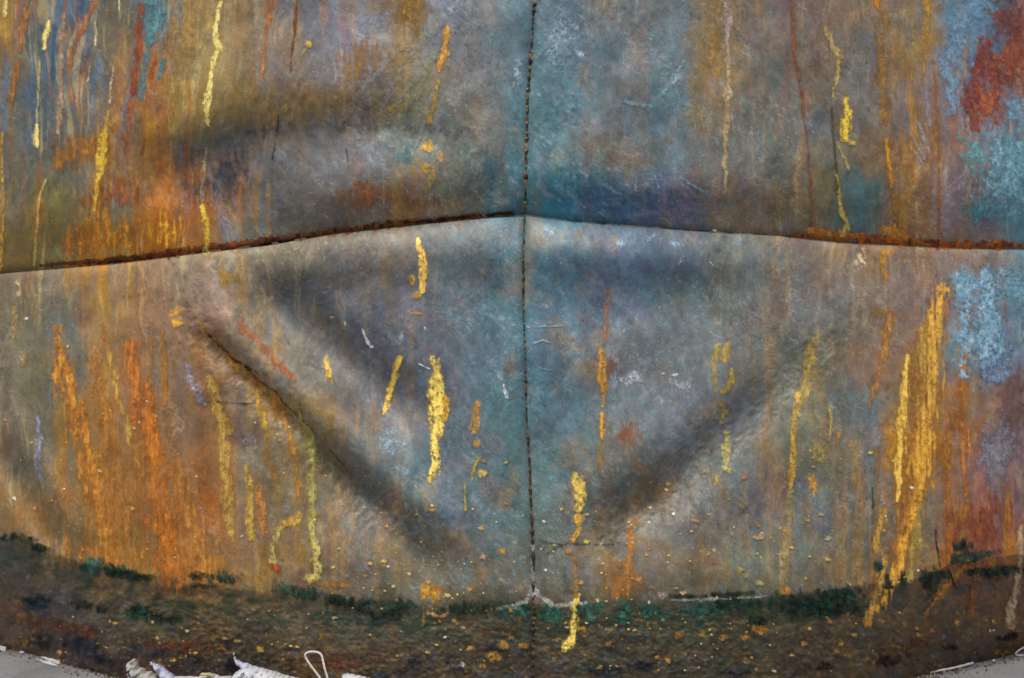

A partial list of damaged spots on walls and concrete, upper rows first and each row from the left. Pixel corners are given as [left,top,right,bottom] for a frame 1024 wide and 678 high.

corrosion [9,0,31,110]
corrosion [54,0,157,175]
corrosion [40,179,514,267]
corrosion [790,0,1024,280]
corrosion [12,324,224,595]
corrosion [199,318,301,498]
corrosion [866,291,1013,620]